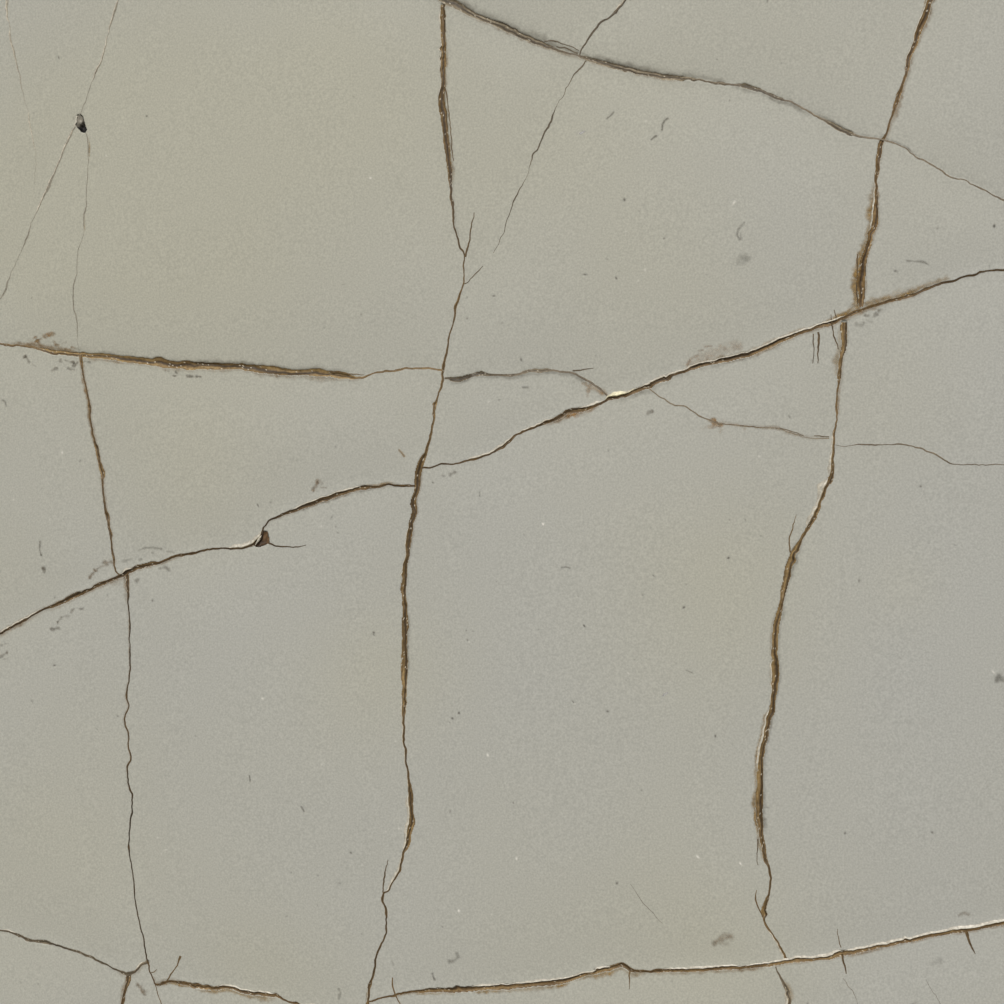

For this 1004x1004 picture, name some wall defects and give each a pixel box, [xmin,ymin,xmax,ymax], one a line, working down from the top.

crack [0,0,118,299]
crack [71,274,79,337]
crack [0,343,442,1004]
crack [366,0,1004,1004]